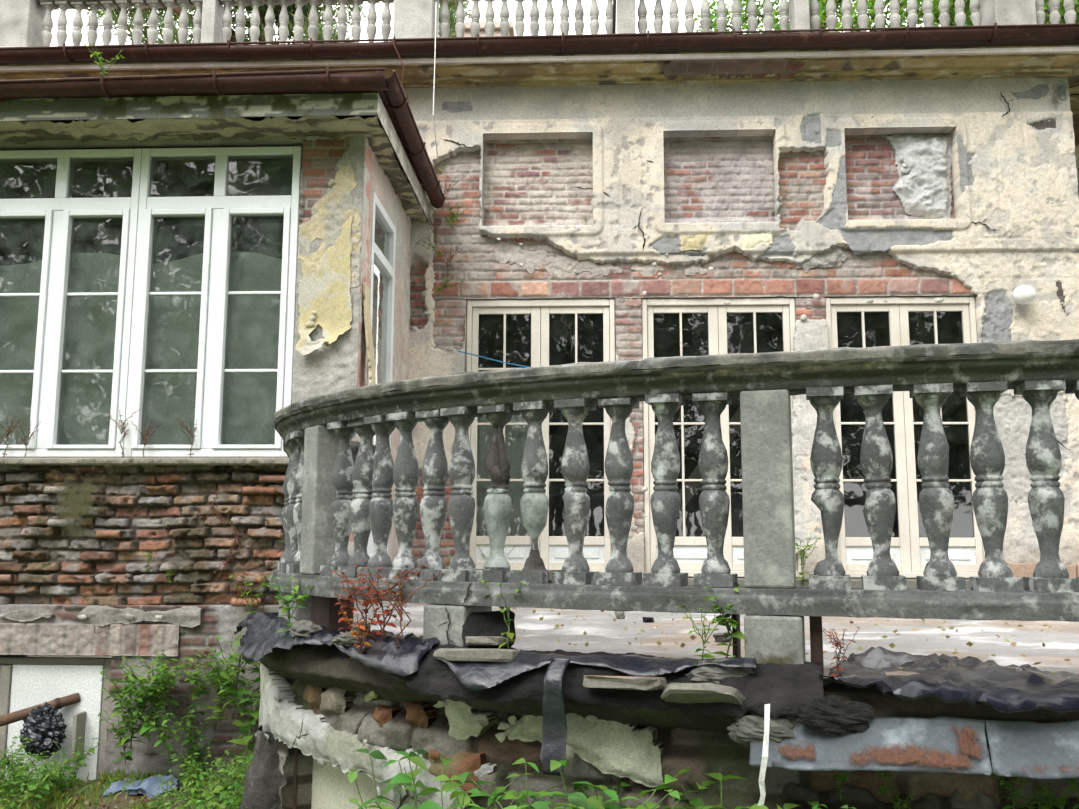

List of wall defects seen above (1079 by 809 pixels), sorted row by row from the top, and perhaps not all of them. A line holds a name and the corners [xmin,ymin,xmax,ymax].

peeling [956,133,975,193]
peeling [295,135,376,385]
crack [632,210,646,250]
spalling [409,114,972,361]
peeling [981,289,1013,343]
spalling [628,401,648,534]
peeling [255,663,543,809]
peeling [566,713,665,787]